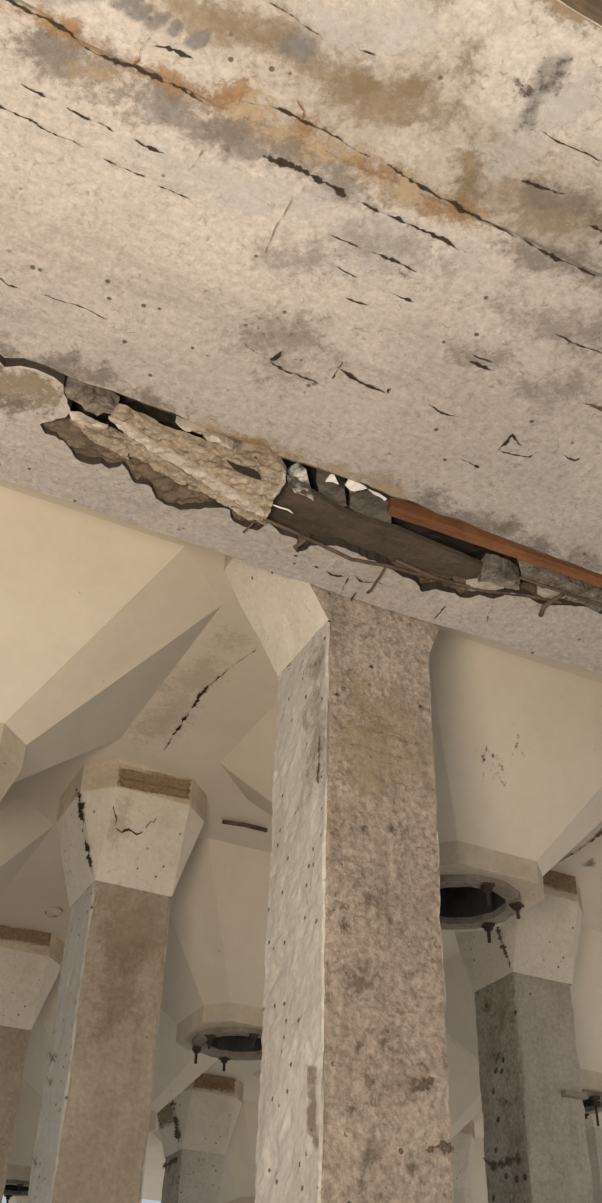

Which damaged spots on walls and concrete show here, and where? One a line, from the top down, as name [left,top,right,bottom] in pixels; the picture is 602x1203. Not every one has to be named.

rust [18,5,111,80]
crack [0,84,203,199]
crack [6,0,214,107]
leakage [113,0,460,125]
rust [138,66,492,227]
crack [243,100,601,280]
leakage [515,58,572,131]
crack [0,278,104,319]
crack [330,235,416,305]
spalling [43,376,602,617]
crack [166,649,256,747]
crack [76,788,157,870]